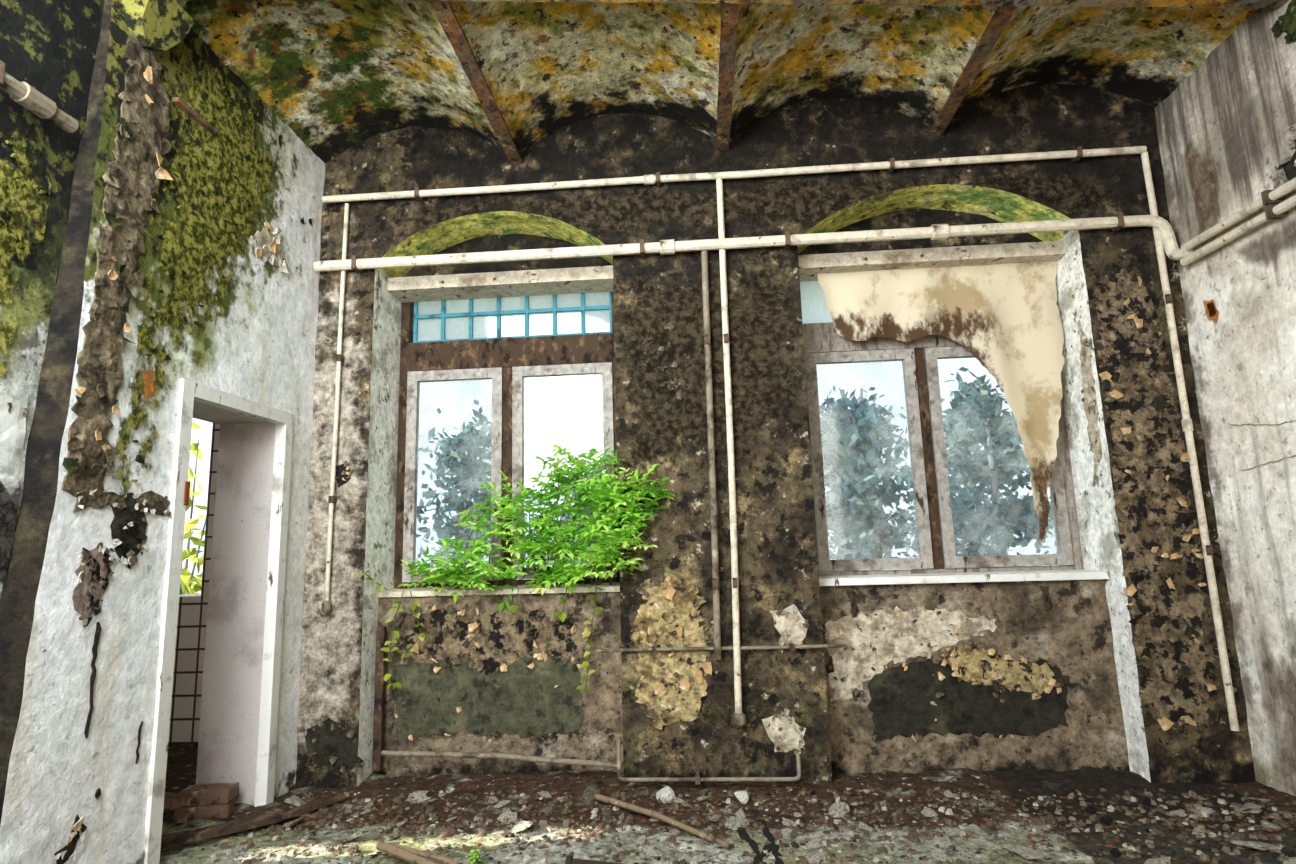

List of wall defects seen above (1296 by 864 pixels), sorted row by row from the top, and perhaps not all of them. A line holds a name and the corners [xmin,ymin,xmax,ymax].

spalling [1271,0,1296,44]
spalling [1269,124,1296,190]
spalling [61,32,173,629]
leakage [0,393,28,587]
peeling [770,604,1071,742]
leakage [1263,624,1296,779]